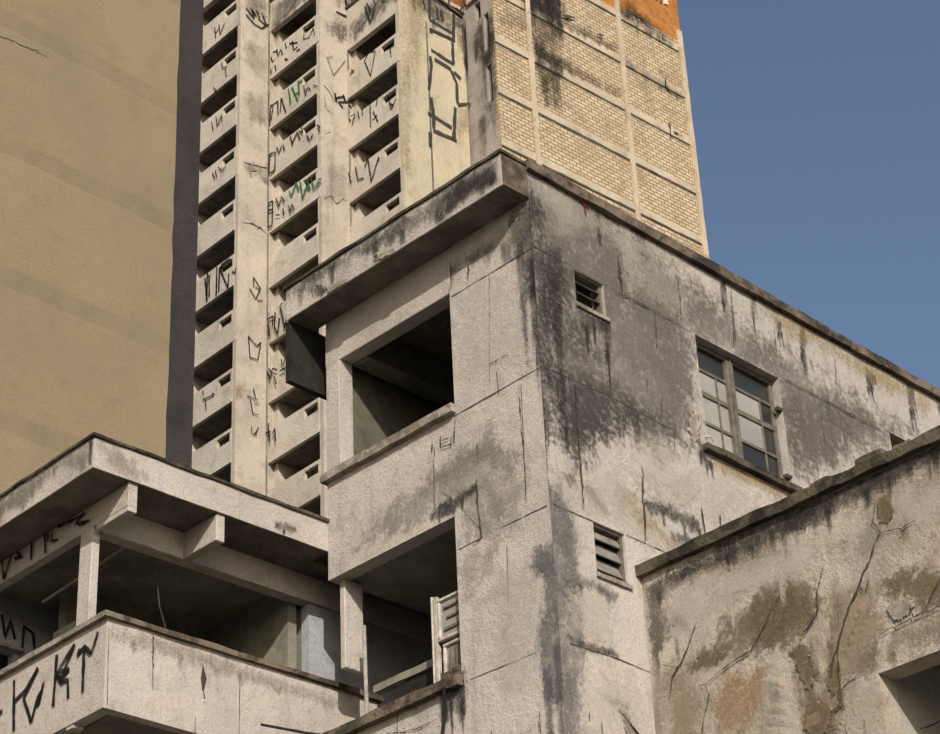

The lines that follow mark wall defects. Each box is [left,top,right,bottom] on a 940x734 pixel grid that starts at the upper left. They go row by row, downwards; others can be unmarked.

leakage [524,0,564,104]
leakage [579,308,611,378]
leakage [431,484,476,522]
leakage [595,443,702,550]
leakage [692,410,785,502]
leakage [531,470,619,734]
crack [664,625,696,699]
crack [700,595,780,733]
leakage [645,445,940,734]
crack [799,566,824,646]
crack [827,500,915,734]
crack [880,579,940,634]